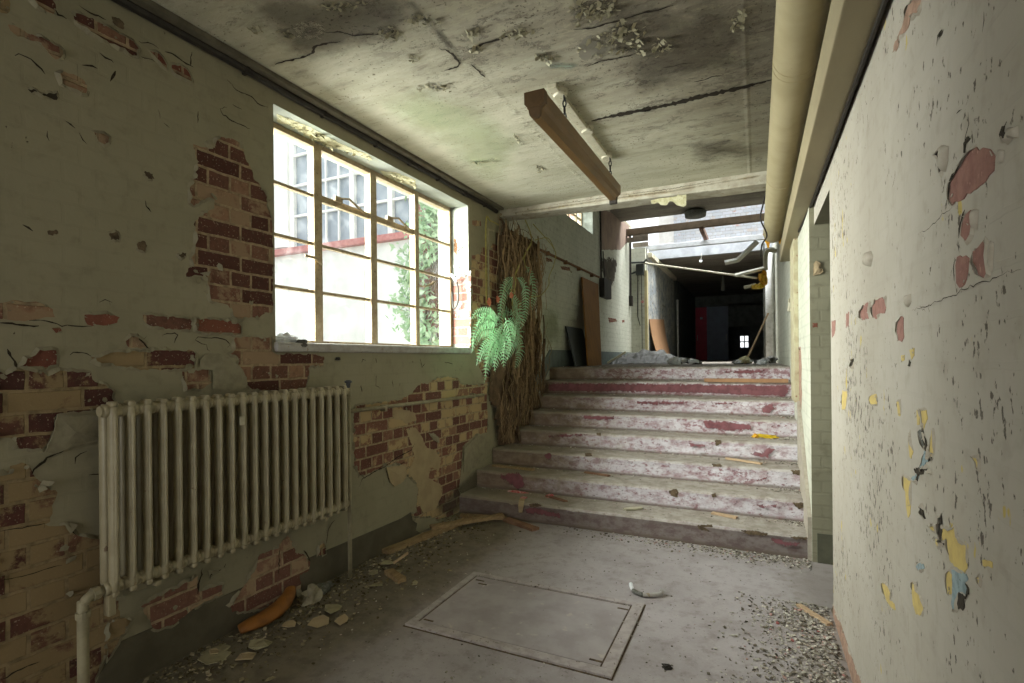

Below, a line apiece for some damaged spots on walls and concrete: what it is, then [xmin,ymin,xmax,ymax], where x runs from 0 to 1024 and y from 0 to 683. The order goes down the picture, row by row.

flaking render [0,0,90,100]
flaking render [70,10,194,84]
crack [275,31,386,65]
peeling [567,0,672,61]
water stain [625,19,727,82]
crack [592,63,771,121]
flaking render [932,122,1013,288]
flaking render [832,295,887,337]
crack [913,261,1021,310]
flaking render [0,135,325,683]
flaking render [352,244,501,522]
peeling [896,399,993,617]